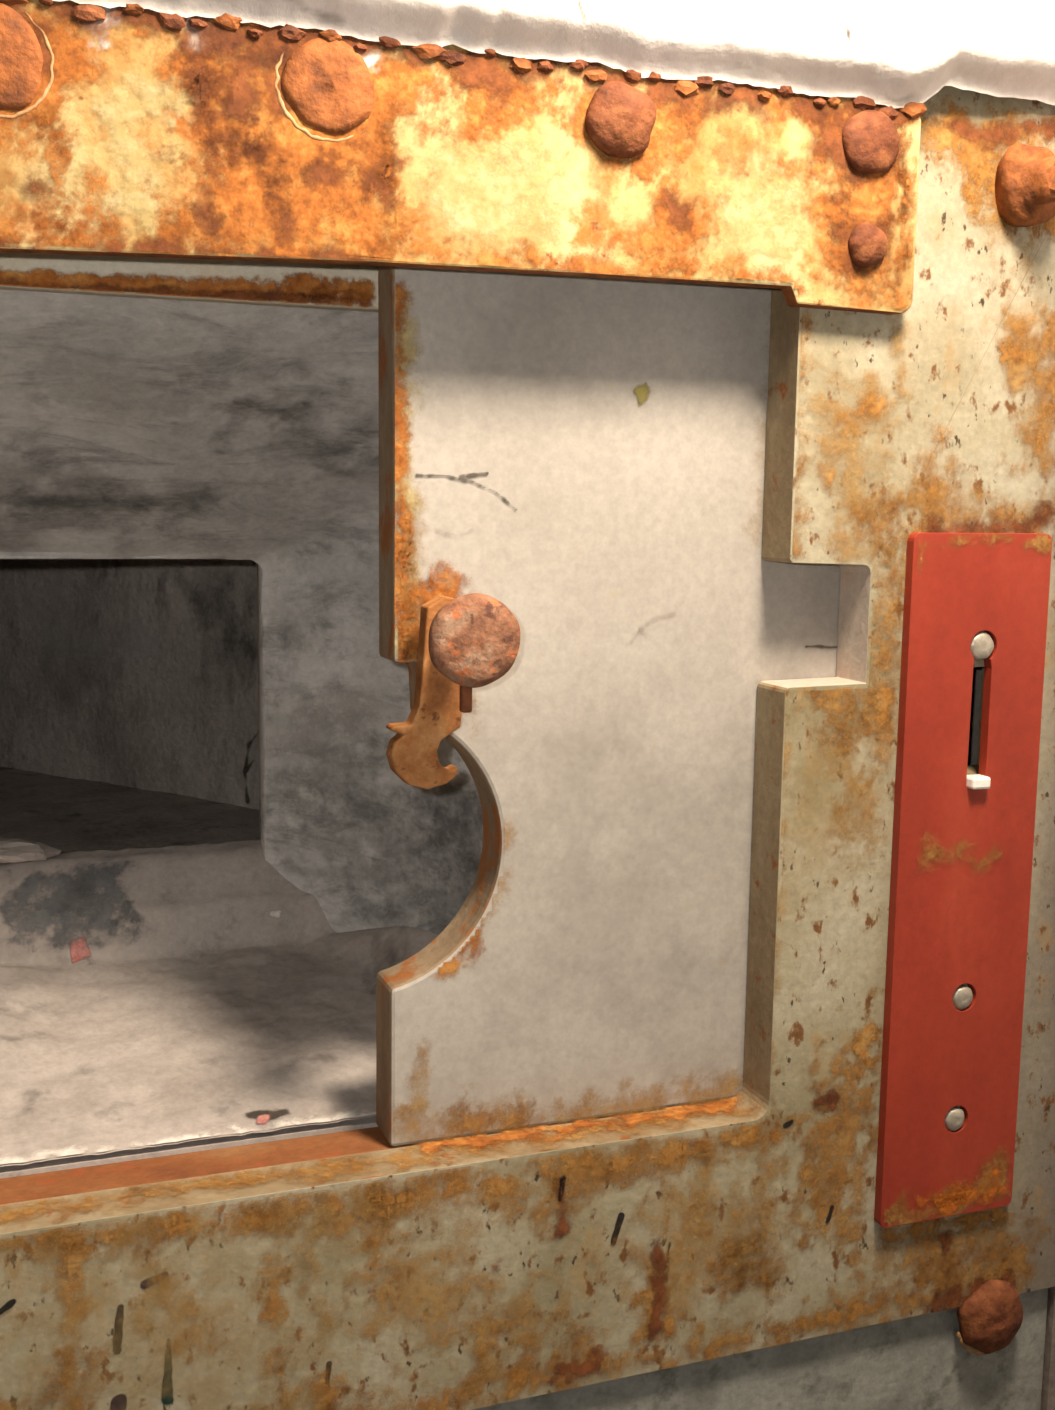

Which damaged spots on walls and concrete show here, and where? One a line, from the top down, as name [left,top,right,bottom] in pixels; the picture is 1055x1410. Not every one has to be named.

corrosion [0,5,1055,310]
corrosion [999,307,1055,477]
corrosion [405,561,465,660]
corrosion [796,371,1055,839]
corrosion [438,918,483,977]
corrosion [0,1022,1046,1410]